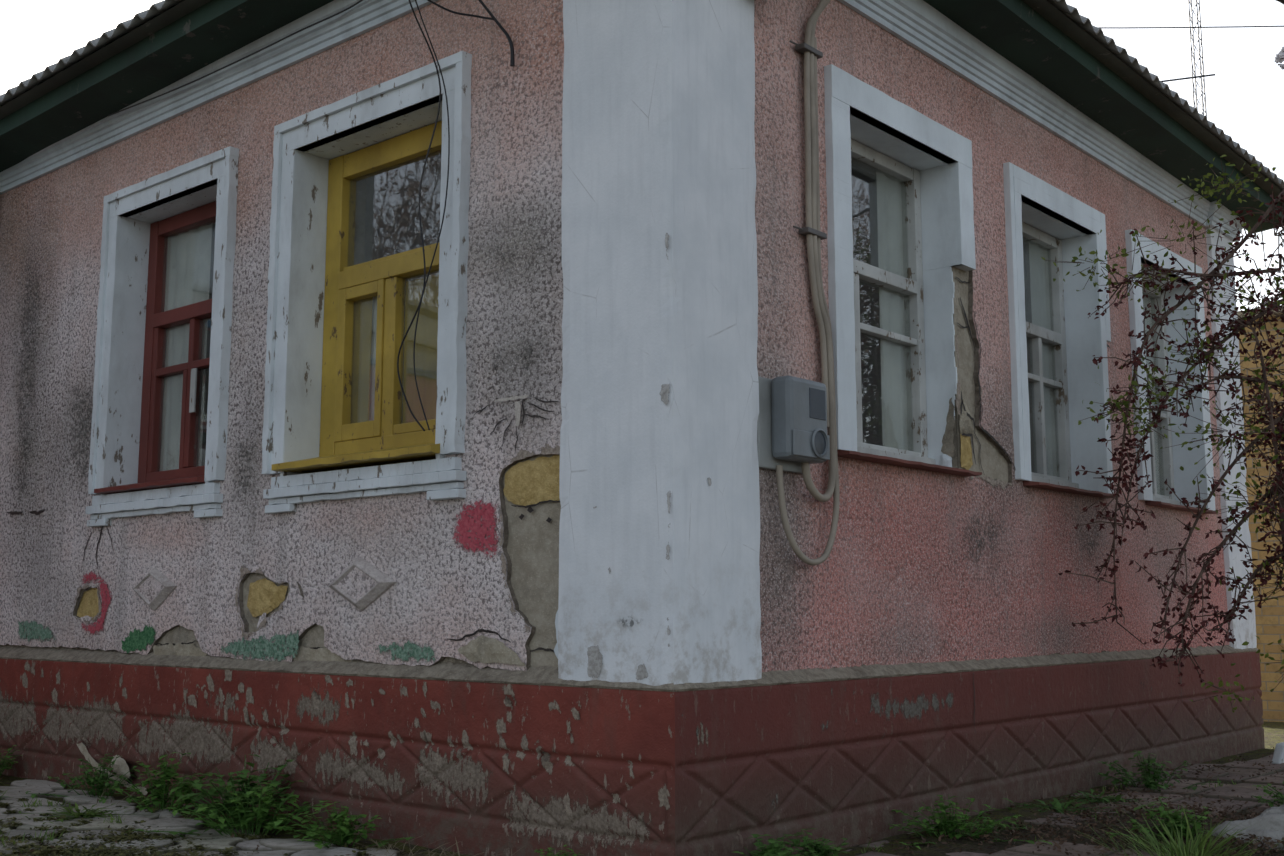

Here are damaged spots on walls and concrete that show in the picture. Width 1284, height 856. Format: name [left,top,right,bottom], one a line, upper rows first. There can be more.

spalling [939,266,1012,490]
crack [7,508,45,516]
spalling [448,443,561,672]
spalling [71,584,102,622]
spalling [235,565,304,640]
peeling [0,625,671,856]
peeling [856,692,953,738]